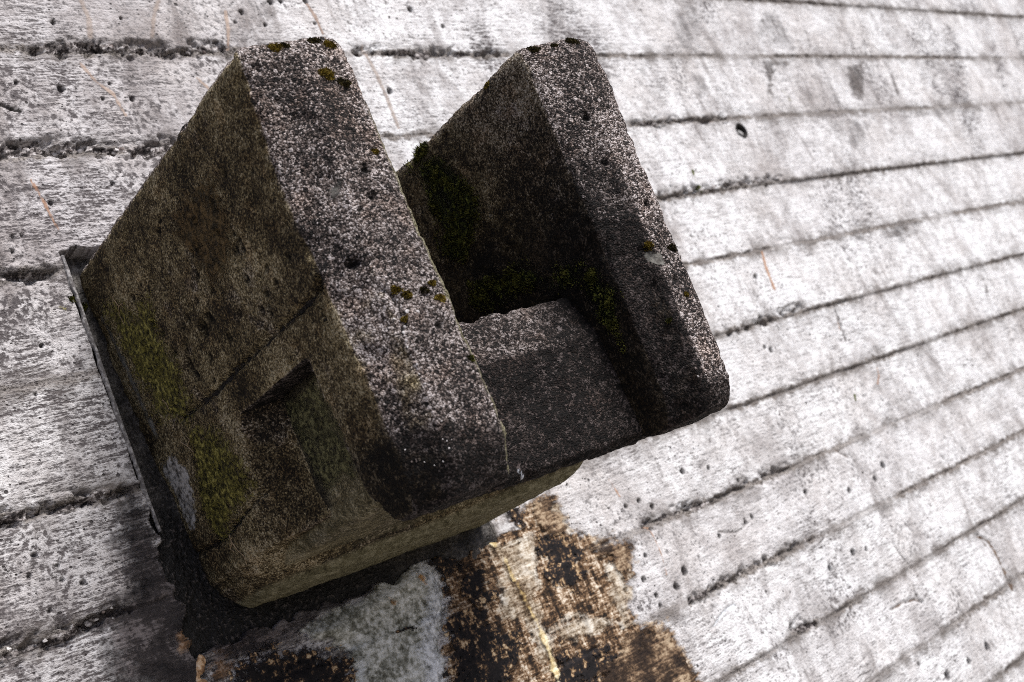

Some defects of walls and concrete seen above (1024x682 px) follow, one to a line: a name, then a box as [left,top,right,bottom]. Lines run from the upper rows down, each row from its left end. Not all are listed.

water stain [163,457,196,529]
corrosion [428,494,701,682]